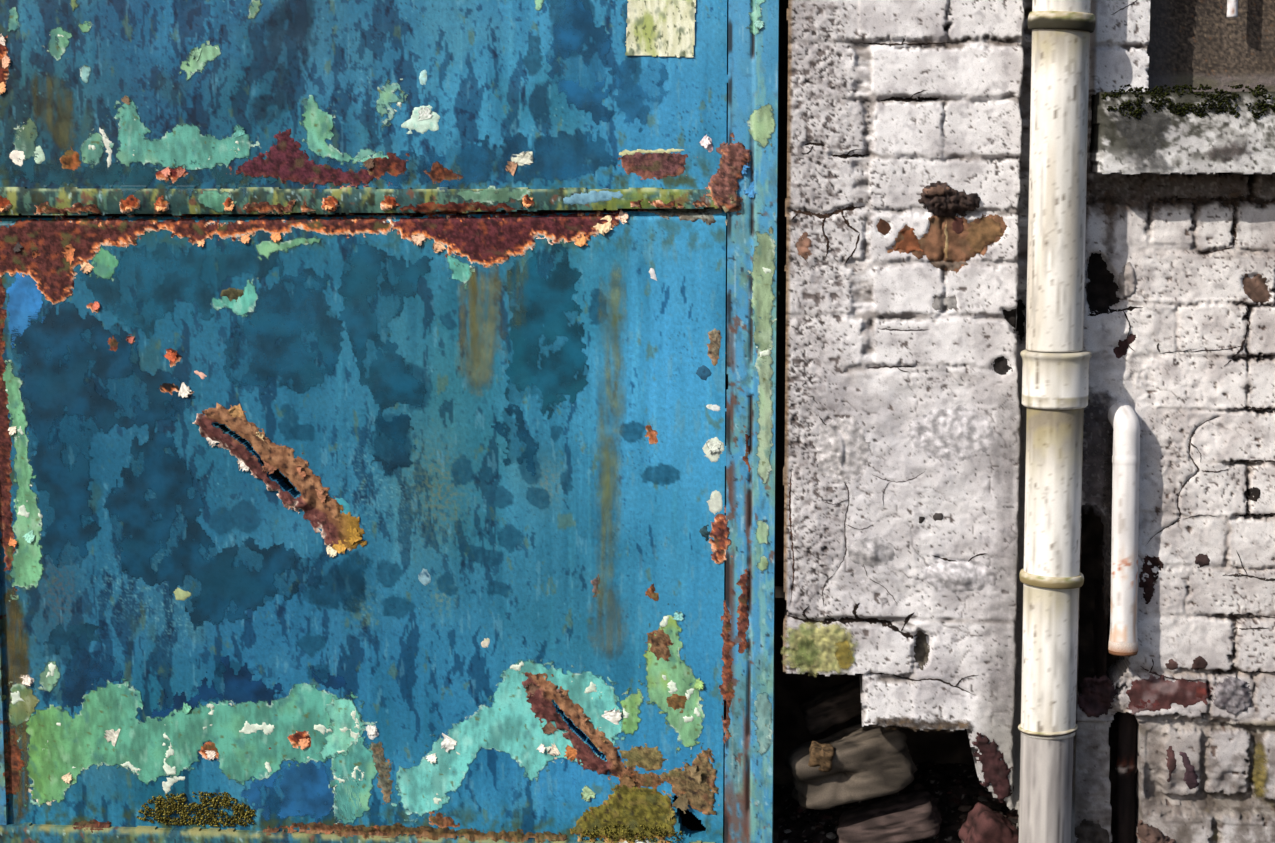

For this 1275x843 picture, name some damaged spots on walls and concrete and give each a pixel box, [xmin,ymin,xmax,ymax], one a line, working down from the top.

rust [0,34,11,95]
peeling [80,95,261,172]
rust [0,128,759,571]
spalling [1085,250,1137,312]
crack [786,469,978,695]
crack [933,553,986,562]
rust [0,587,30,819]
rust [198,741,219,760]
peeling [1,603,705,825]
rust [263,568,750,843]
spalling [785,677,942,843]
spalling [958,732,1019,843]